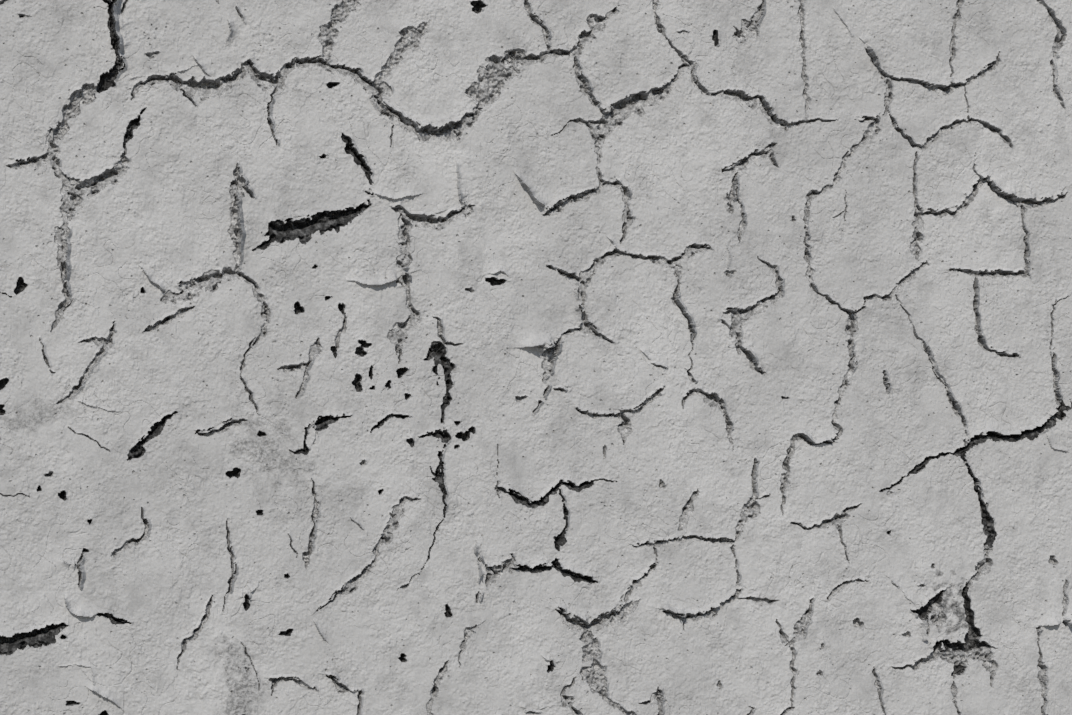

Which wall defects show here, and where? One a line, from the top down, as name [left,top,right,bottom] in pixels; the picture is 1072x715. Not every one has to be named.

spalling [325,296,347,358]
spalling [352,340,409,392]
crack [7,0,838,591]
crack [554,0,1072,715]
spalling [454,421,476,449]
crack [0,551,134,656]
crack [176,519,240,670]
crack [312,496,421,643]
crack [426,445,614,715]
spalling [886,562,972,638]
crack [240,642,365,715]